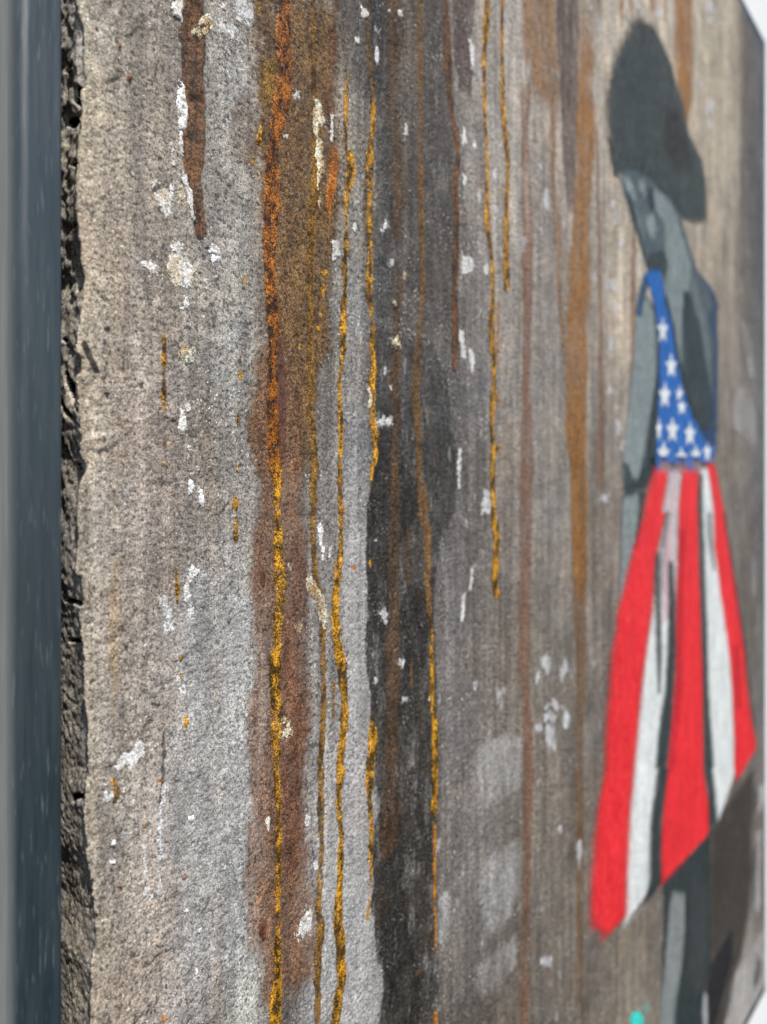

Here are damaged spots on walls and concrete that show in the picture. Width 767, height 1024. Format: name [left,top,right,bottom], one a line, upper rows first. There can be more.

rust [178,0,207,239]
rust [237,0,380,1024]
leakage [324,0,457,1024]
rust [482,0,557,599]